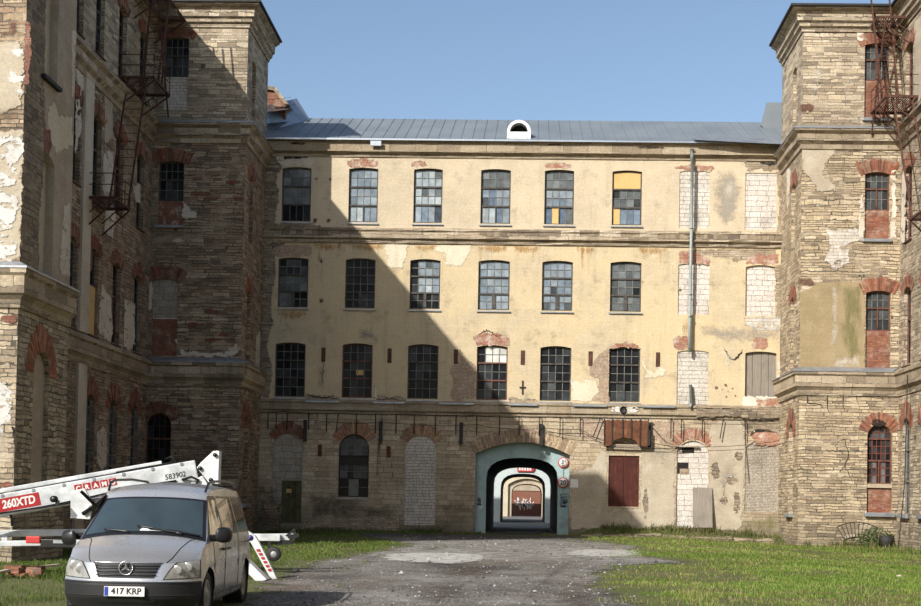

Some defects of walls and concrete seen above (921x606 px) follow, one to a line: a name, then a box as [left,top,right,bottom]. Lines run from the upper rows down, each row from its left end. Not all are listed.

peeling [0,0,85,277]
peeling [181,177,219,219]
leakage [718,175,737,222]
peeling [384,244,409,268]
peeling [435,244,472,266]
spalling [450,349,476,401]
spalling [571,341,641,413]
peeling [642,360,666,378]
peeling [569,418,699,530]
peeling [696,384,780,530]